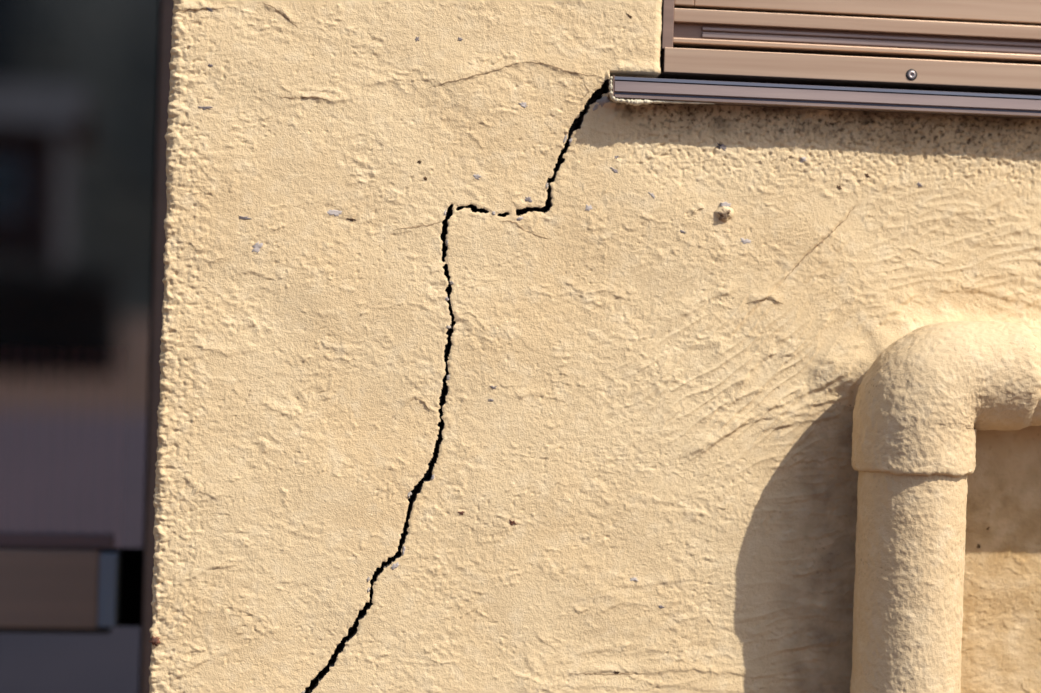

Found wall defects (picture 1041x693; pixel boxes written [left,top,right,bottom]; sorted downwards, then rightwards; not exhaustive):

crack [302,62,610,693]